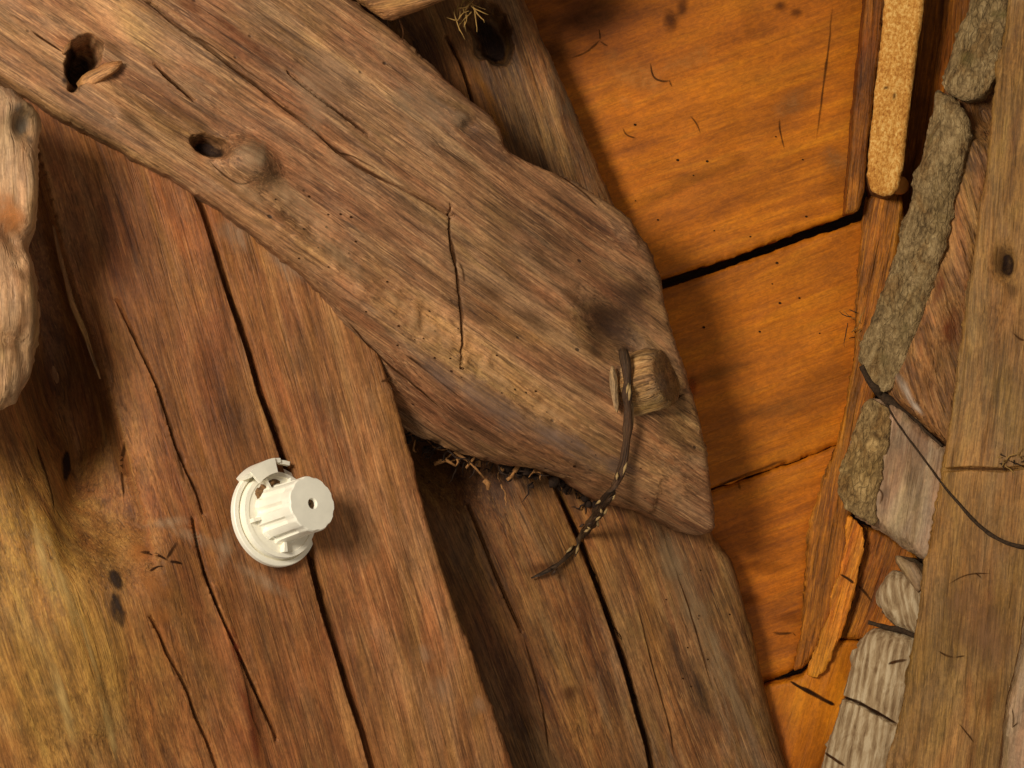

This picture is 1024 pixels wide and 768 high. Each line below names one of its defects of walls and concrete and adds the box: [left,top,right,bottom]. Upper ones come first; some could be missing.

crack [153,379,192,484]
crack [210,240,288,471]
crack [448,219,464,354]
crack [157,631,208,746]
crack [142,543,264,721]
crack [306,552,362,736]
crack [550,477,673,766]